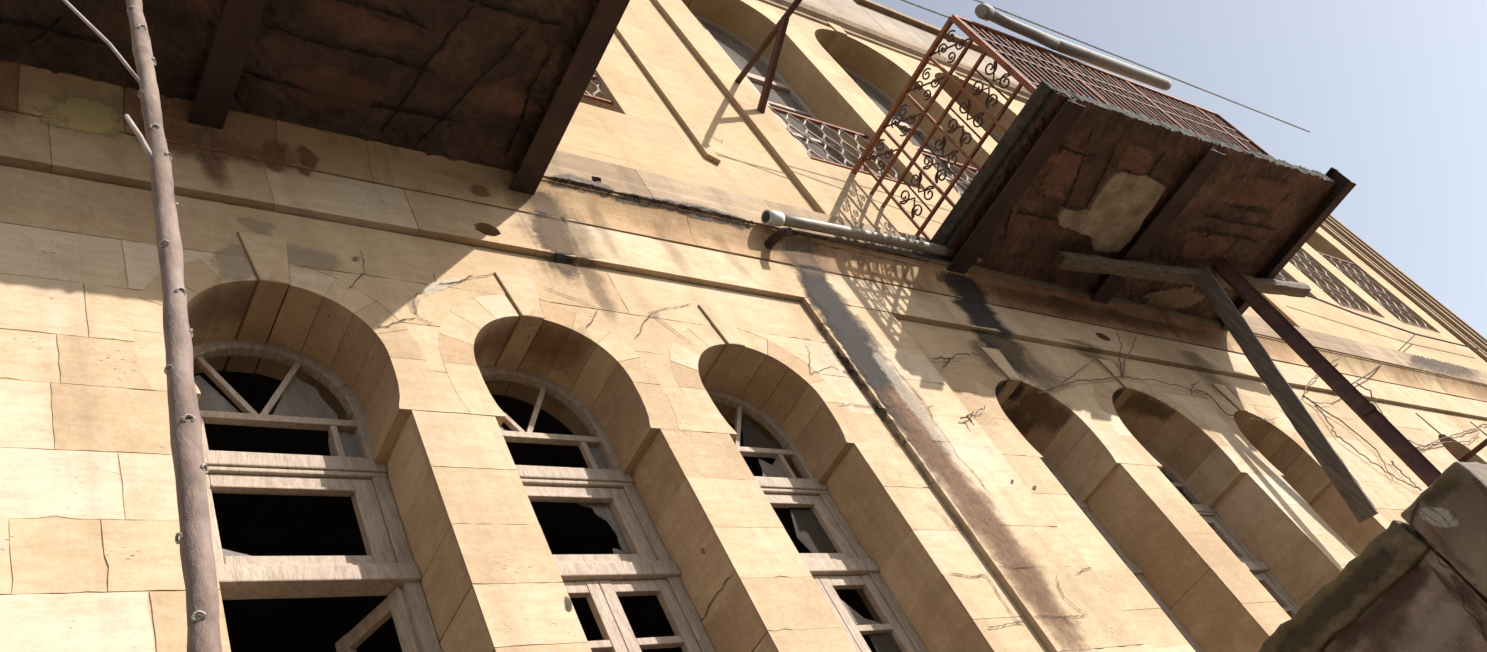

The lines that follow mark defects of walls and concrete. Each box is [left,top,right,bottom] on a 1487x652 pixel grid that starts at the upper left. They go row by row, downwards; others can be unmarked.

leakage [522,193,594,275]
crack [378,272,495,327]
crack [636,303,692,342]
leakage [780,230,1082,650]